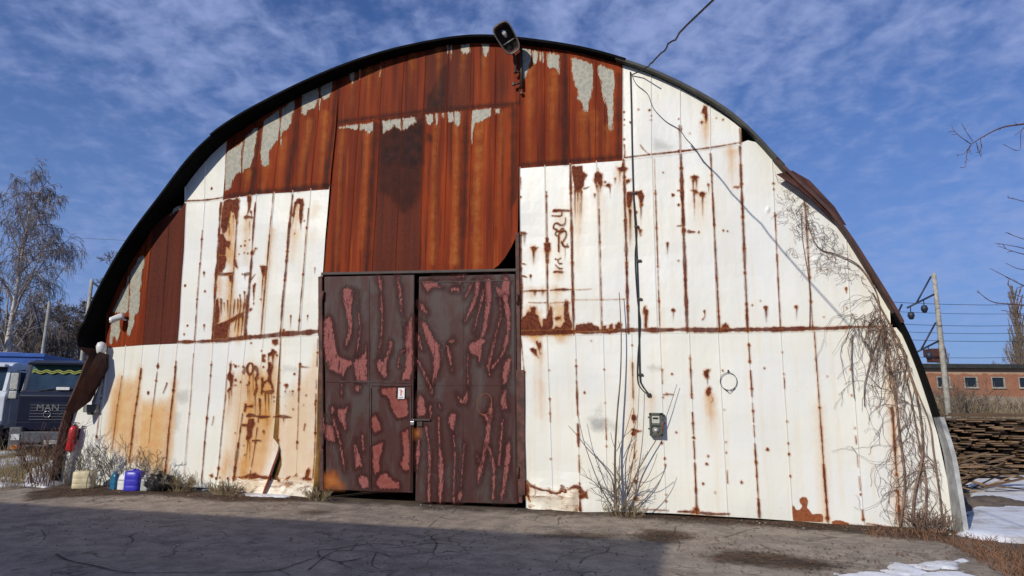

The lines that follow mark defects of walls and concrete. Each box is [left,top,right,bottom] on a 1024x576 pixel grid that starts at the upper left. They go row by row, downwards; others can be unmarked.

peeling [225,81,333,191]
peeling [339,108,500,143]
peeling [522,47,615,131]
peeling [109,255,145,345]
rust [178,68,519,482]
rust [511,110,887,526]
rust [111,361,176,474]
peeling [323,275,512,503]